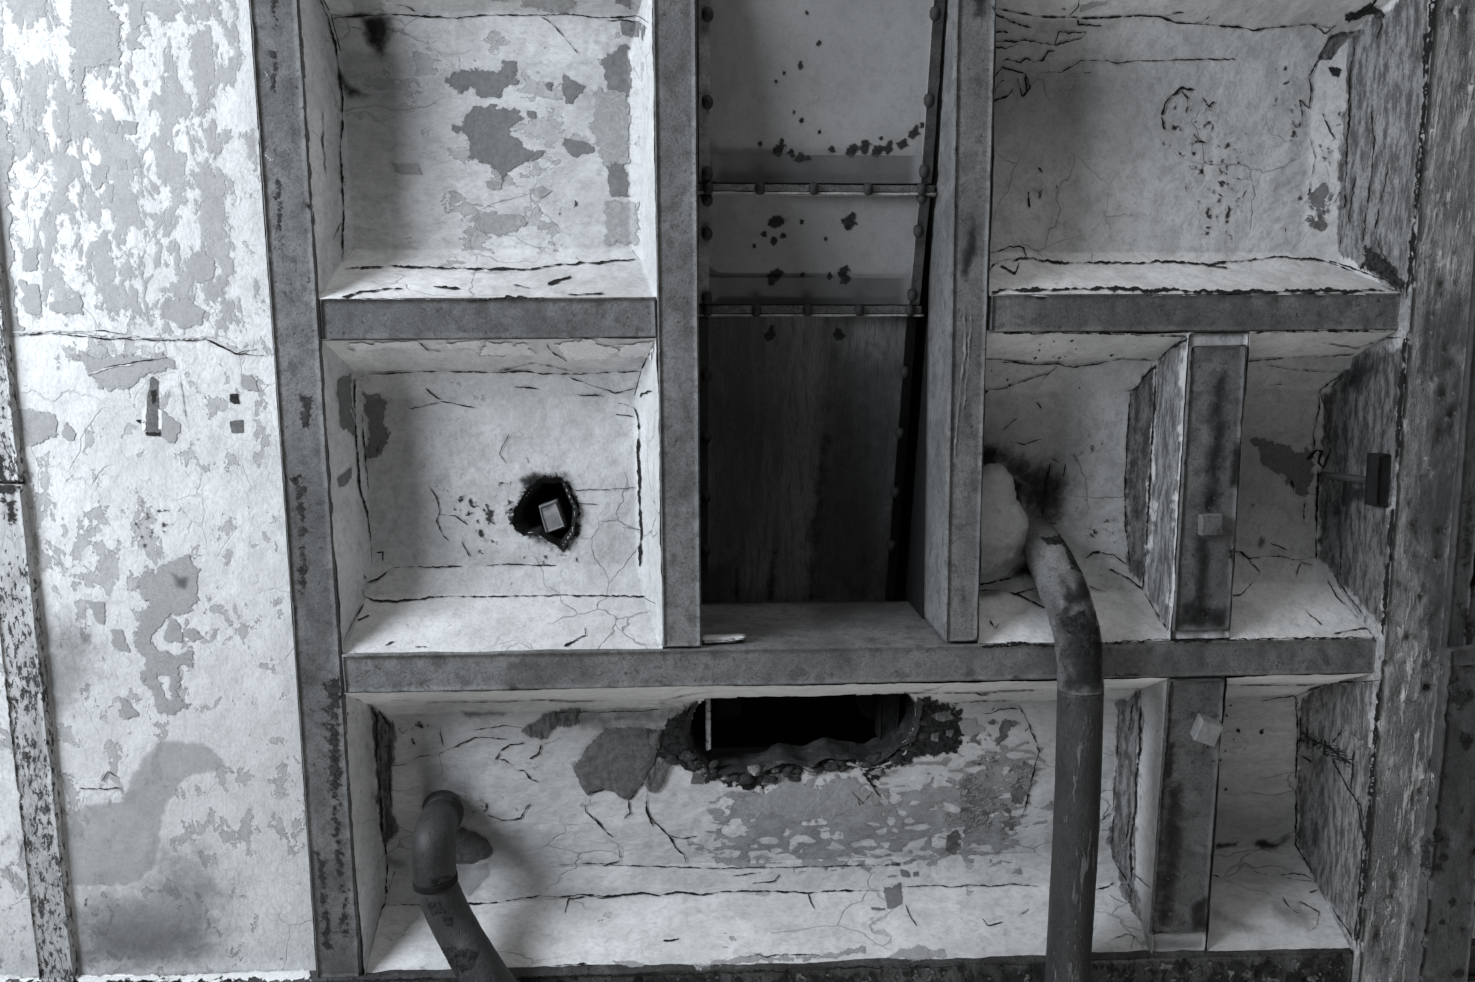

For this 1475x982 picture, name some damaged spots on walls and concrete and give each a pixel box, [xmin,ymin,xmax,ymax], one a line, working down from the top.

peeling [0,0,284,444]
peeling [444,59,545,189]
rust [752,216,804,248]
rust [758,138,811,163]
rust [841,212,857,230]
rust [793,110,924,157]
crack [990,0,1397,295]
crack [344,363,654,647]
spalling [508,472,581,552]
crack [980,339,1187,628]
crack [468,758,1039,926]
peeling [656,696,1054,911]